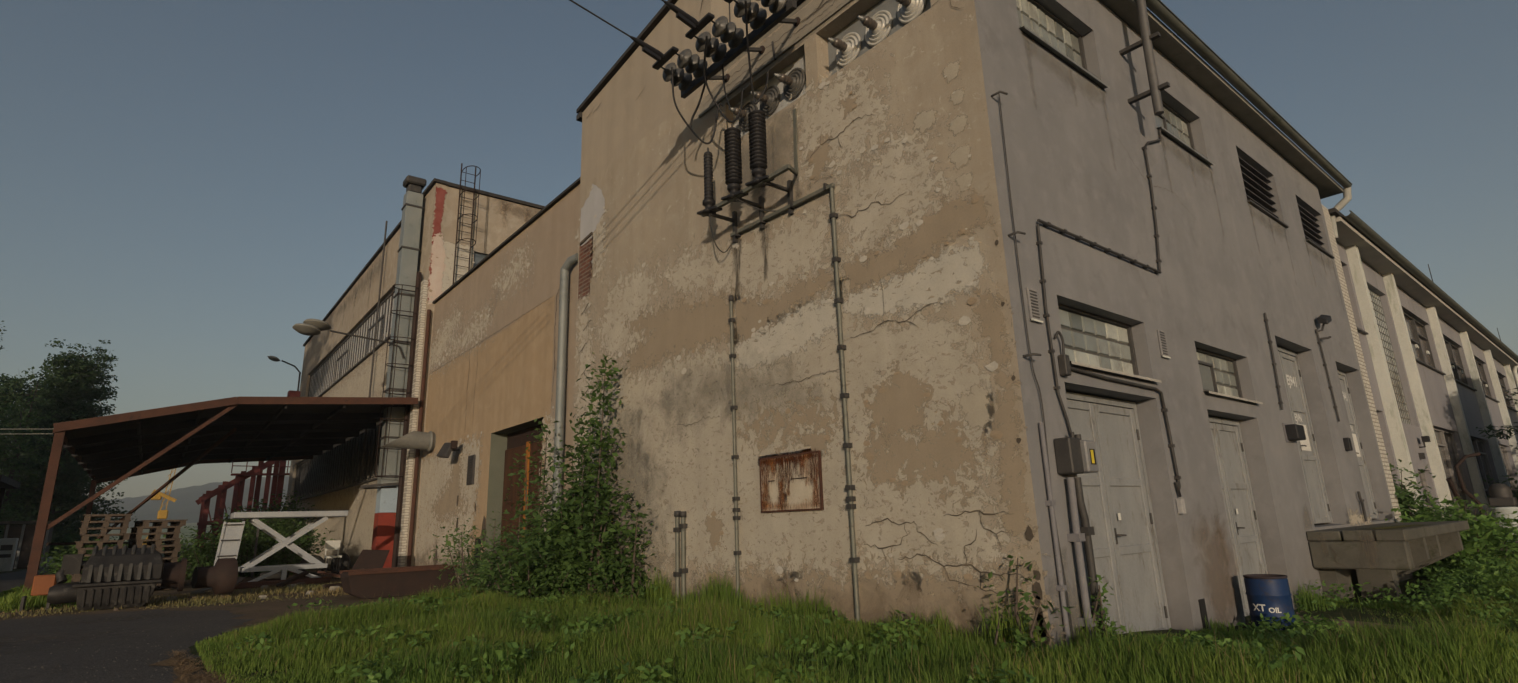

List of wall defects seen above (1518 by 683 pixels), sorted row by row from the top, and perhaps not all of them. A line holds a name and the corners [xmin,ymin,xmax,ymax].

peeling [427,47,1067,648]
corrosion [760,453,820,510]
crack [864,510,1029,594]